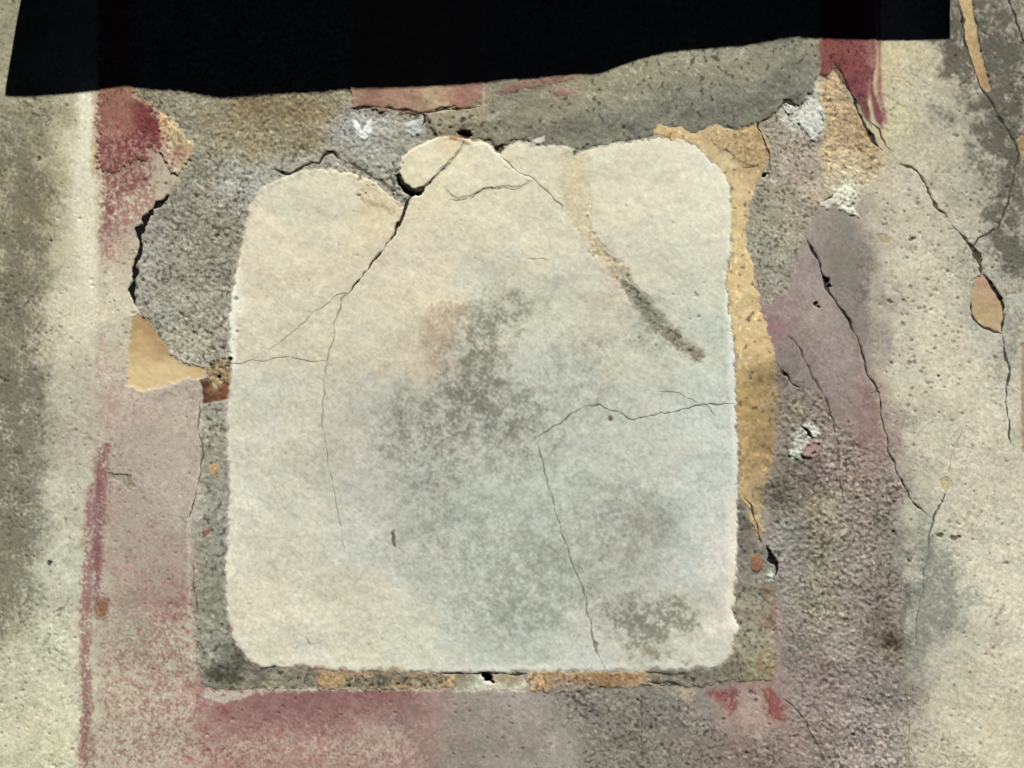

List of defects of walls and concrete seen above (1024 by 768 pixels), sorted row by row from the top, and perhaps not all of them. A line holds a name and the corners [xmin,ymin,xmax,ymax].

crack [128,195,168,304]
spalling [130,0,532,366]
crack [228,147,563,548]
crack [537,391,730,670]
crack [744,100,824,168]
crack [781,336,846,503]
crack [805,235,962,646]
crack [823,7,1020,443]
spalling [969,275,1005,333]